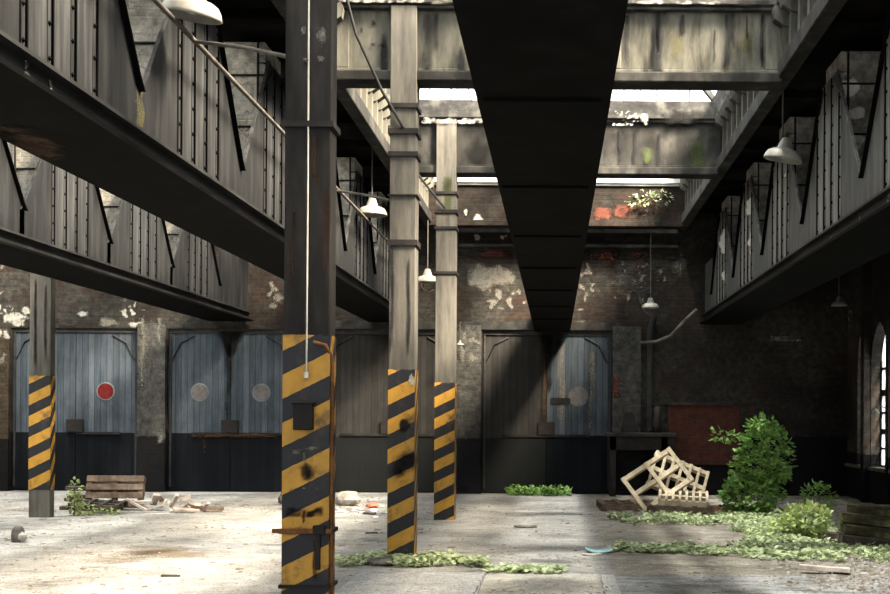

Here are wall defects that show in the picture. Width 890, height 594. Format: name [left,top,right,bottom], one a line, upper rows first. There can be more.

damp [371,37,388,70]
damp [423,14,438,70]
damp [638,0,663,72]
damp [713,14,735,67]
peeling [100,302,140,327]
peeling [468,263,525,310]
peeling [576,263,595,322]
peeling [612,261,666,301]